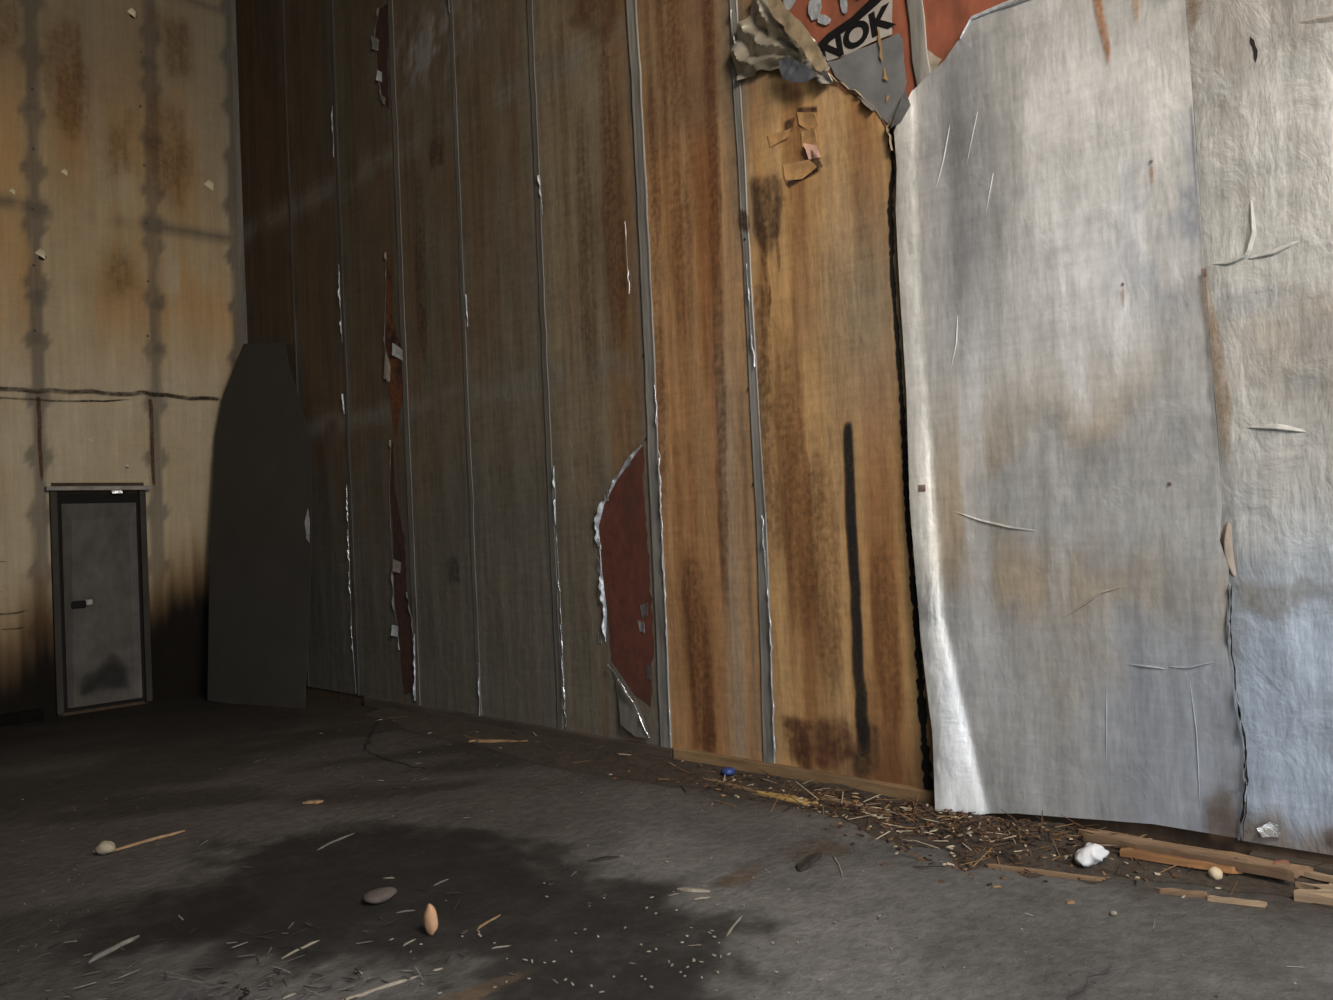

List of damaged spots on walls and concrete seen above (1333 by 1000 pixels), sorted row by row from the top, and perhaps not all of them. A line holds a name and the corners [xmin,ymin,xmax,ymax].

peeling [730,0,907,152]
corrosion [0,387,218,484]
peeling [383,343,403,382]
peeling [594,445,654,738]
leakage [88,826,729,1000]